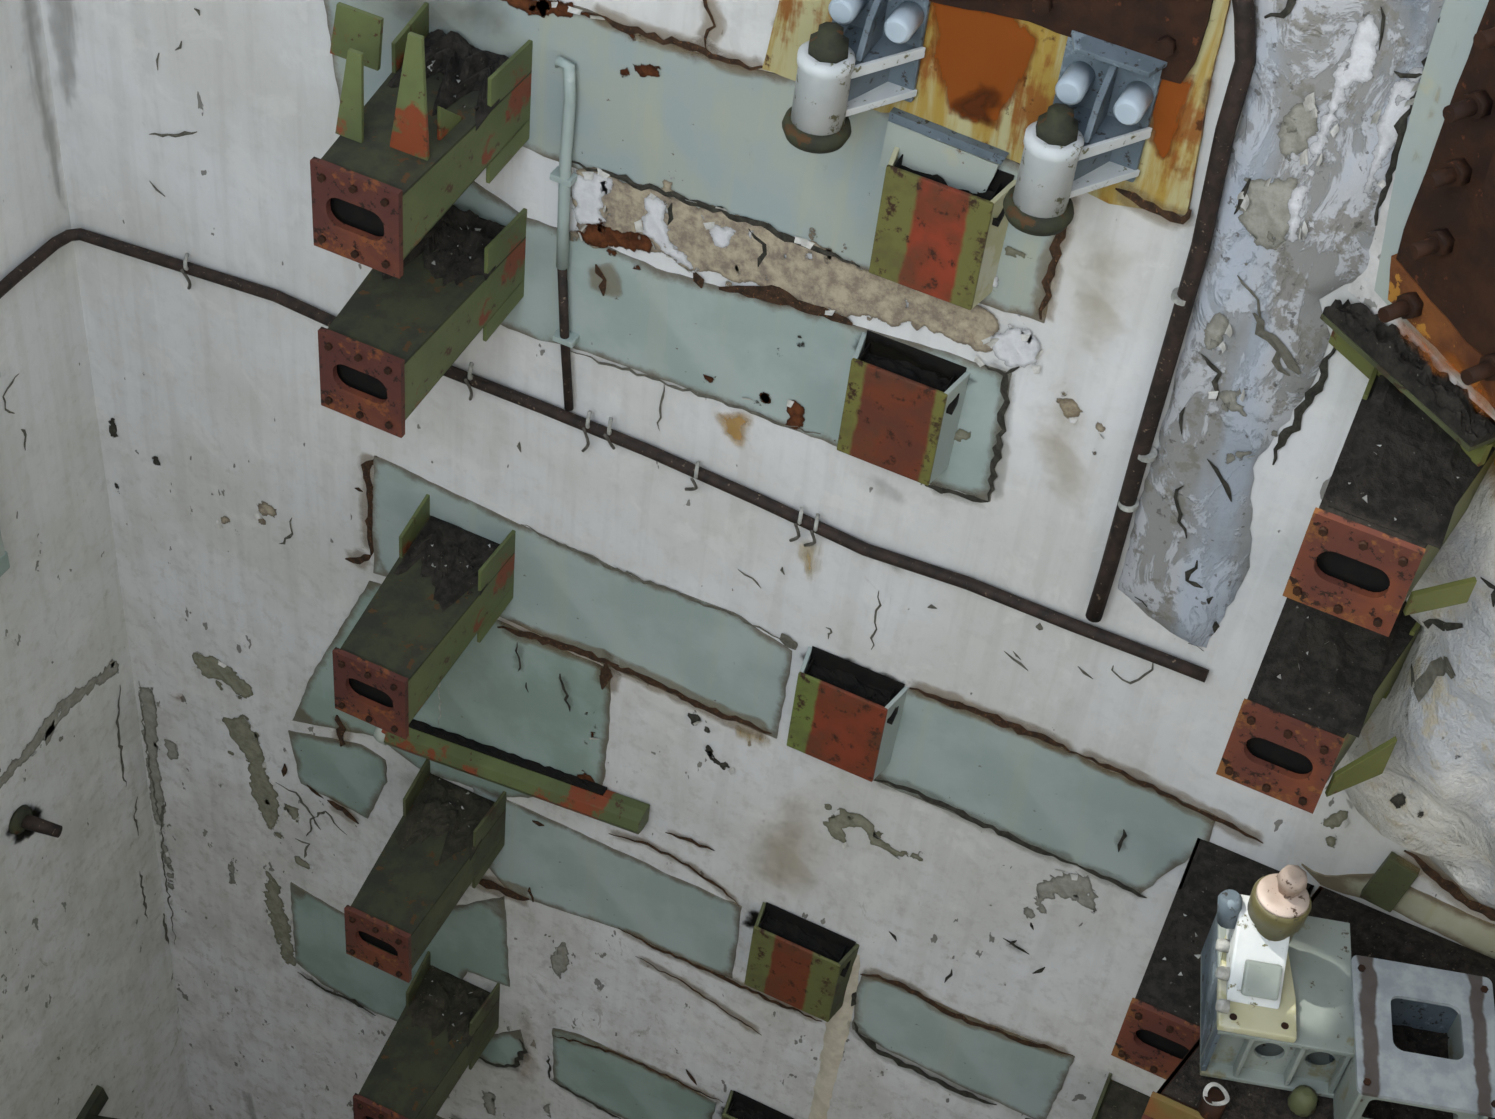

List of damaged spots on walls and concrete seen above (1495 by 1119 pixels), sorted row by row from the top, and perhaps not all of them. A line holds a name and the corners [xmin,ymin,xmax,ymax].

corrosion [931,2,1037,128]
corrosion [1150,79,1212,159]
peeling [1235,14,1380,258]
peeling [1363,67,1423,199]
spalling [569,161,1043,374]
spalling [742,392,805,429]
peeling [0,659,119,789]
peeling [138,687,179,889]
peeling [191,652,300,844]
peeling [264,871,296,966]
peeling [823,804,923,861]
peeling [1023,869,1098,919]